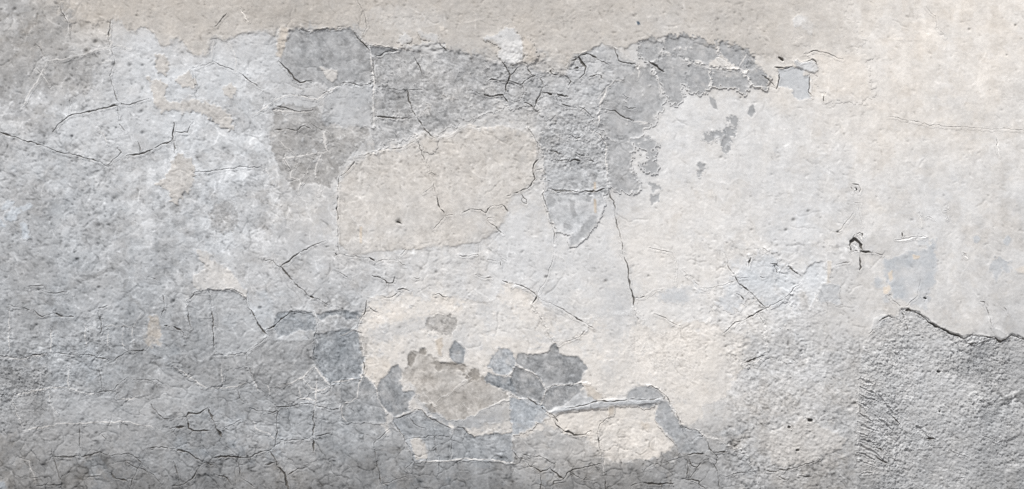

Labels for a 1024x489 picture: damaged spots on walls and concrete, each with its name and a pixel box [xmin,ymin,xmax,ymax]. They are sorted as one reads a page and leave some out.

crack [0,2,196,169]
crack [189,0,669,348]
peeling [267,26,772,247]
crack [681,46,845,104]
crack [25,283,69,296]
crack [0,286,822,489]
peeling [167,249,760,489]
crack [698,246,802,369]
spalling [766,312,1024,489]
crack [866,277,1024,347]